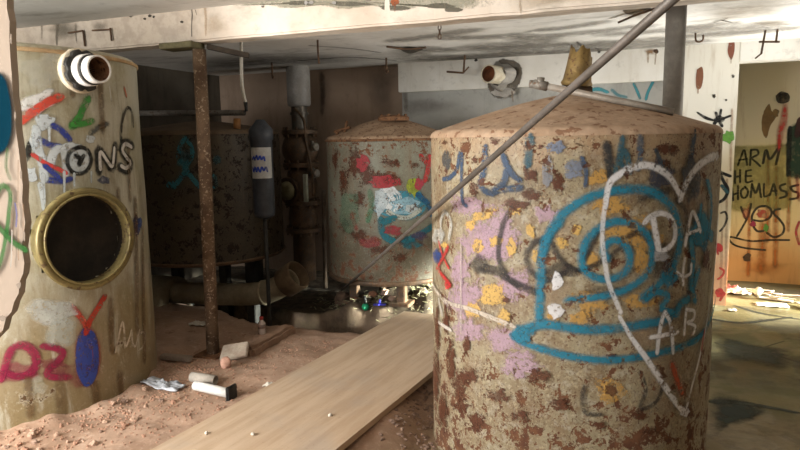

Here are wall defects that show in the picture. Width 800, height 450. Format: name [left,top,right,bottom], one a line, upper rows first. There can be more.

corrosion [653,142,680,157]
corrosion [332,142,420,210]
corrosion [504,166,541,212]
corrosion [550,170,564,194]
corrosion [339,217,416,263]
corrosion [432,299,513,432]
corrosion [523,368,555,383]
corrosion [549,398,569,411]